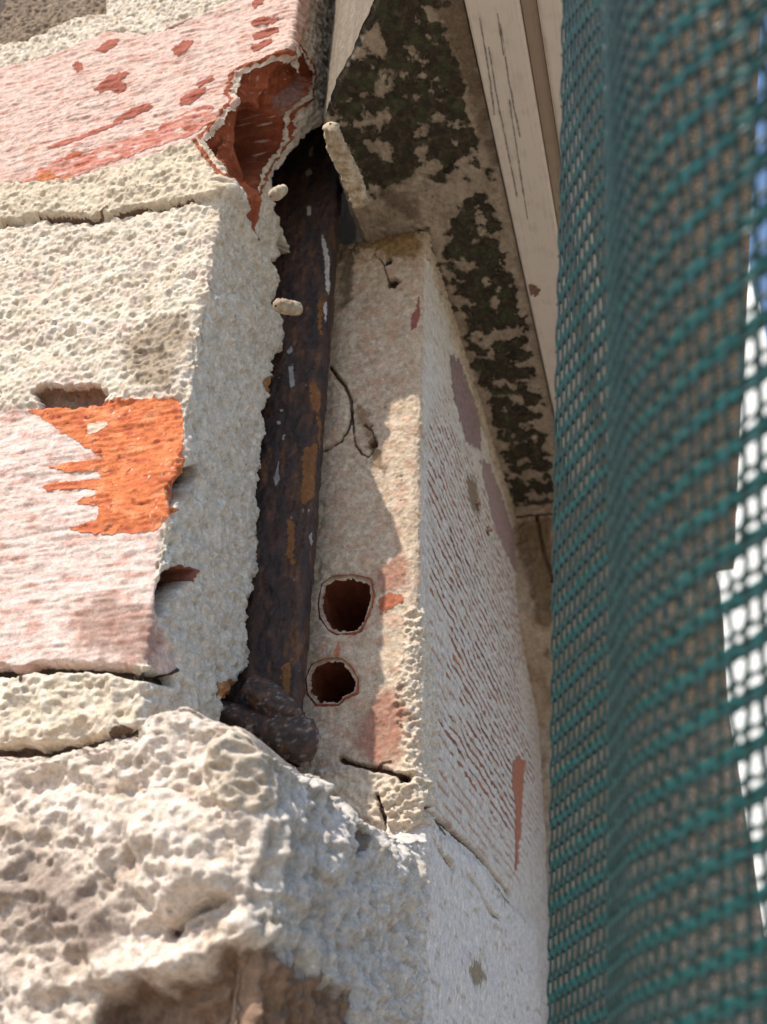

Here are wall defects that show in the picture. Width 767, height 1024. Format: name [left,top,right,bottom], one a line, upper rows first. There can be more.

spalling [11,42,318,241]
damp [321,0,558,626]
peeling [28,396,185,535]
corrosion [300,382,322,505]
corrosion [284,519,296,565]
corrosion [216,679,238,699]
crack [341,758,411,828]